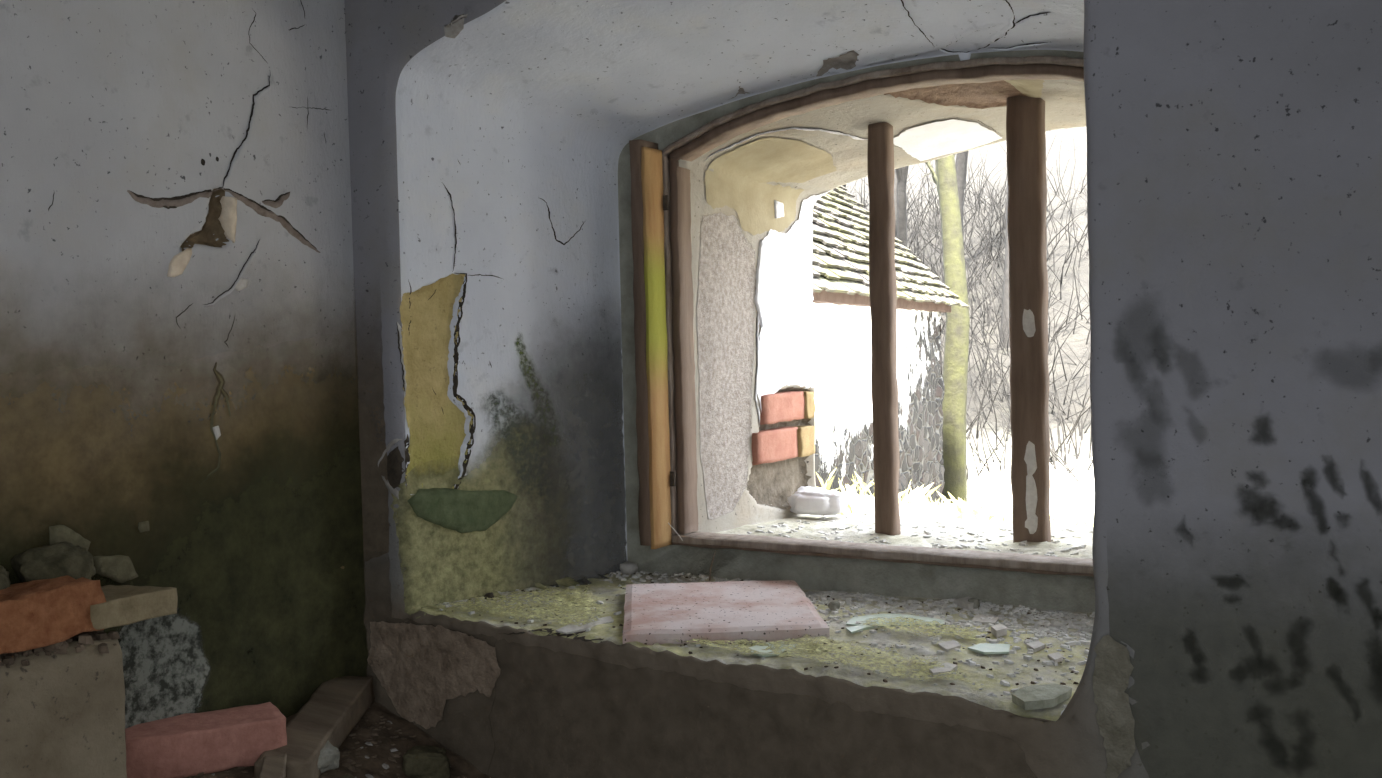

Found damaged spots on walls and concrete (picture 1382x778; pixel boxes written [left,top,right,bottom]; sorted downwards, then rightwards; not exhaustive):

crack [861,0,1051,67]
crack [222,11,328,189]
flaking render [167,188,237,277]
flaking render [697,137,837,520]
flaking render [378,273,518,533]
water stain [1244,475,1297,528]
water stain [1303,464,1347,532]
water stain [0,329,1038,778]
water stain [1329,579,1382,621]